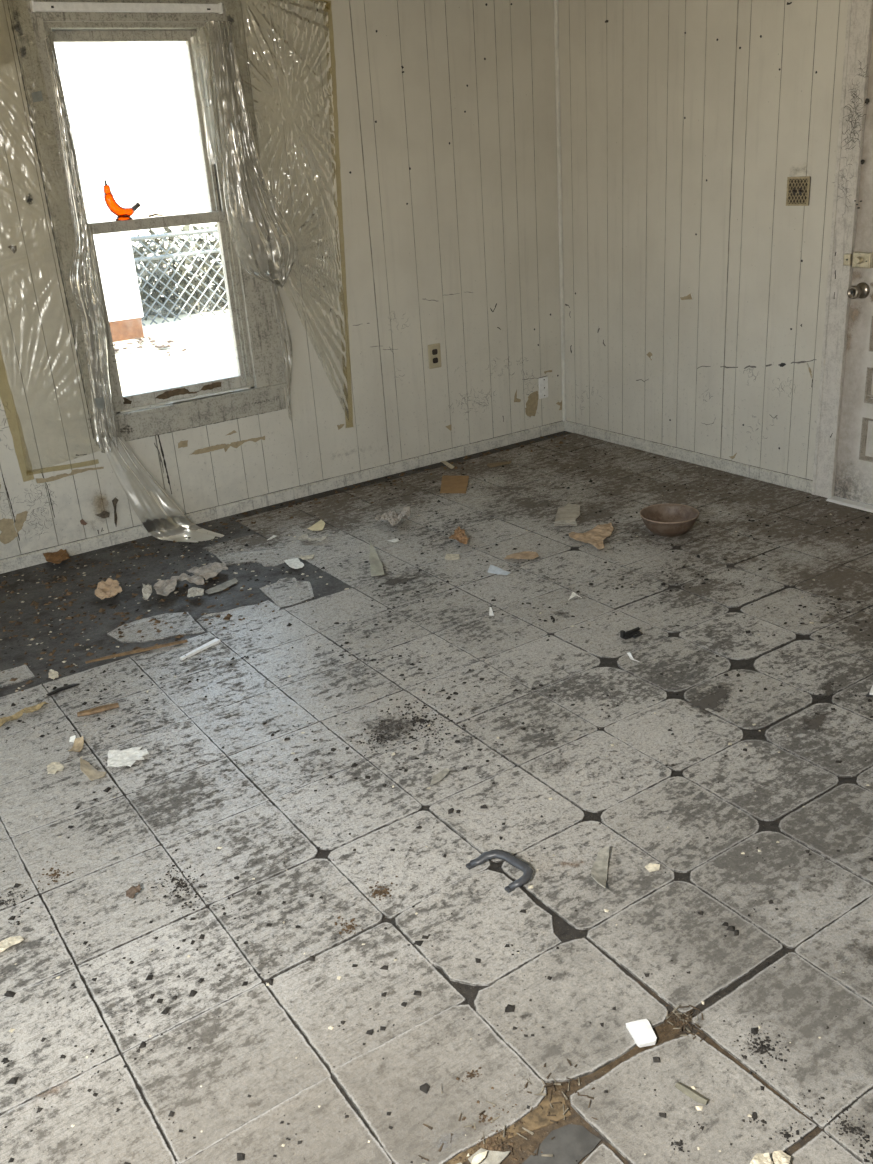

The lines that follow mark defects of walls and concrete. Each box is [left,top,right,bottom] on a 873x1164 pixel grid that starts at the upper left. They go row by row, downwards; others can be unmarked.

peeling [514,390,538,418]
peeling [178,430,265,455]
peeling [0,510,29,544]
peeling [284,554,314,569]